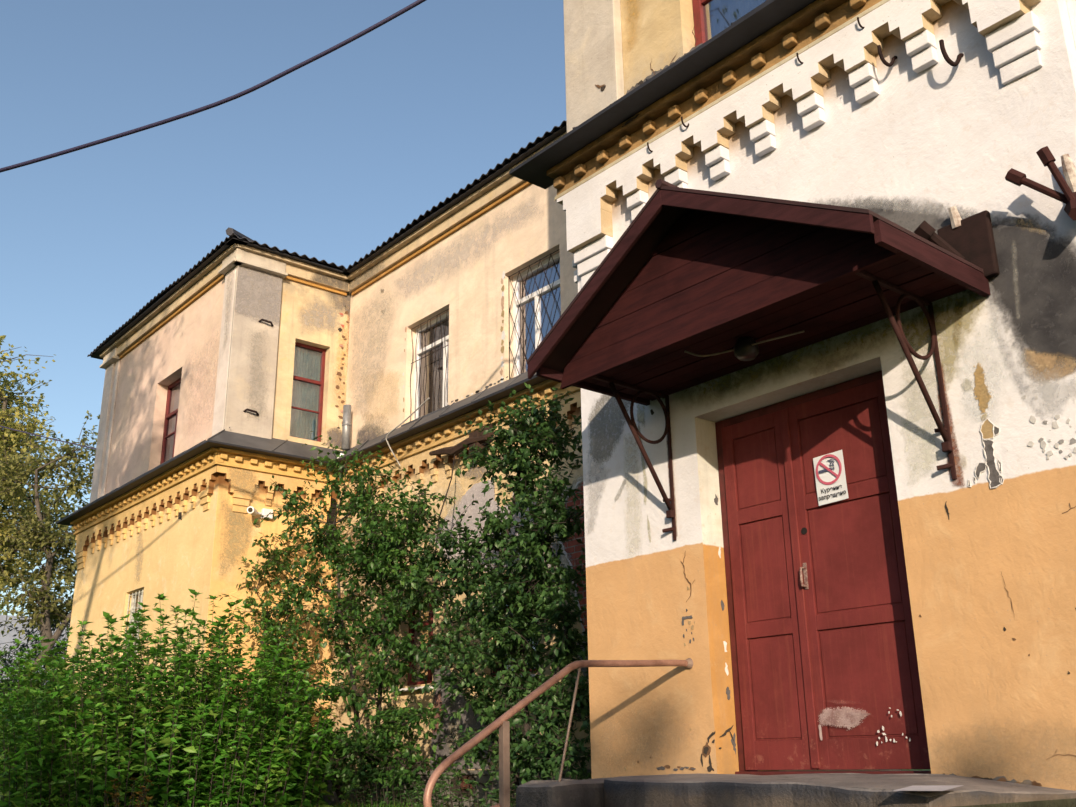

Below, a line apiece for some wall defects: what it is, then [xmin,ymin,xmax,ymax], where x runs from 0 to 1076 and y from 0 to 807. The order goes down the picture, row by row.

water stain [820,198,970,234]
water stain [905,218,1076,411]
water stain [588,395,644,531]
peeling [964,363,1004,489]
peeling [1028,414,1076,460]
flaking render [624,732,715,772]